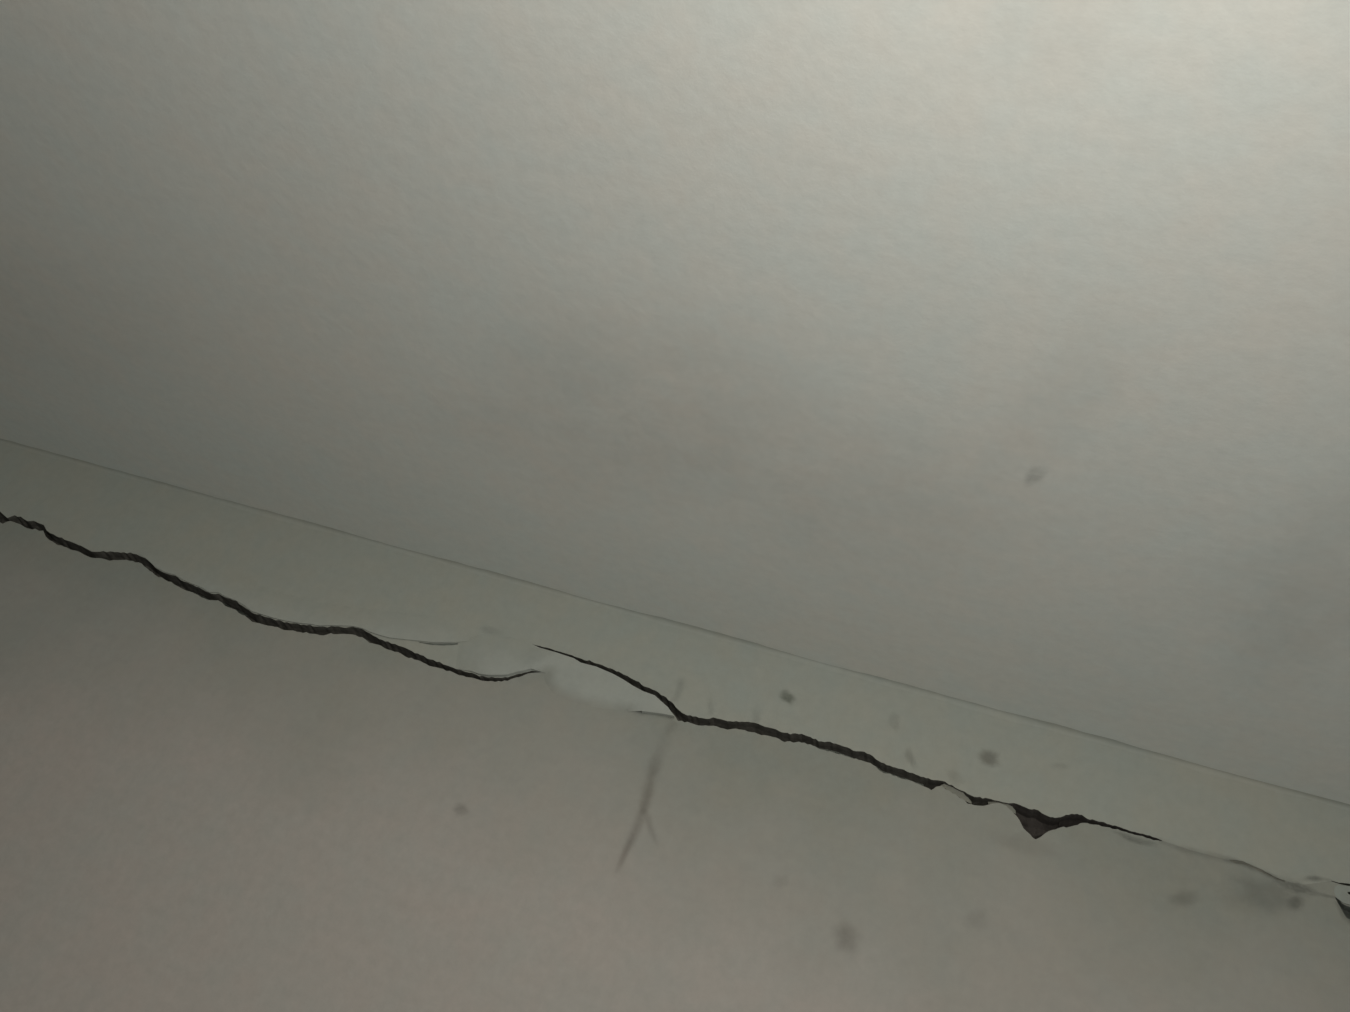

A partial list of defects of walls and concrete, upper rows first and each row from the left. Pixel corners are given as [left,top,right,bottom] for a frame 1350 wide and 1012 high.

crack [0,512,1016,814]
crack [1058,814,1162,841]
crack [1230,860,1285,882]
flaking render [1334,885,1350,919]